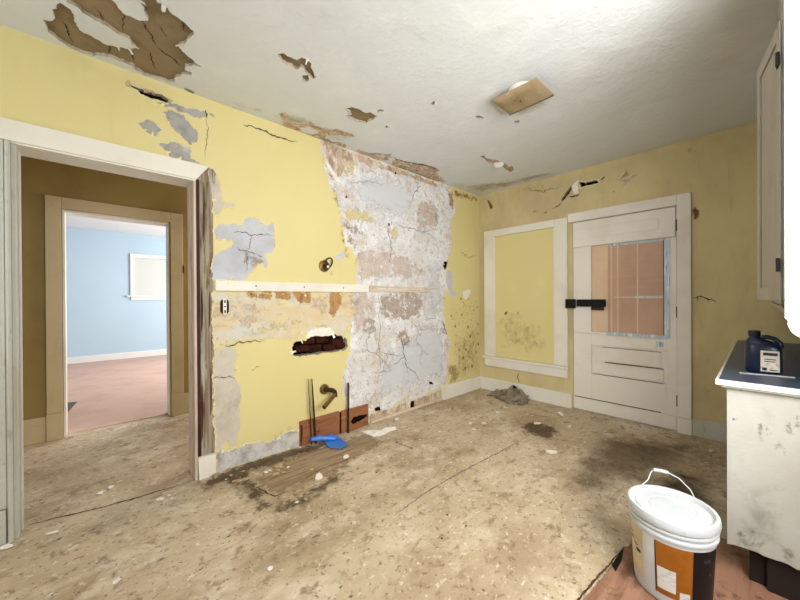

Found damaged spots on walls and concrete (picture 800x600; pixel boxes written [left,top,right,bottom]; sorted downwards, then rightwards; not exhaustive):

flaking render [43,0,201,82]
flaking render [278,53,315,82]
peeling [123,80,276,281]
crack [245,125,294,142]
flaking render [345,107,384,123]
flaking render [481,156,514,172]
peeling [211,112,471,472]
crack [364,299,446,377]